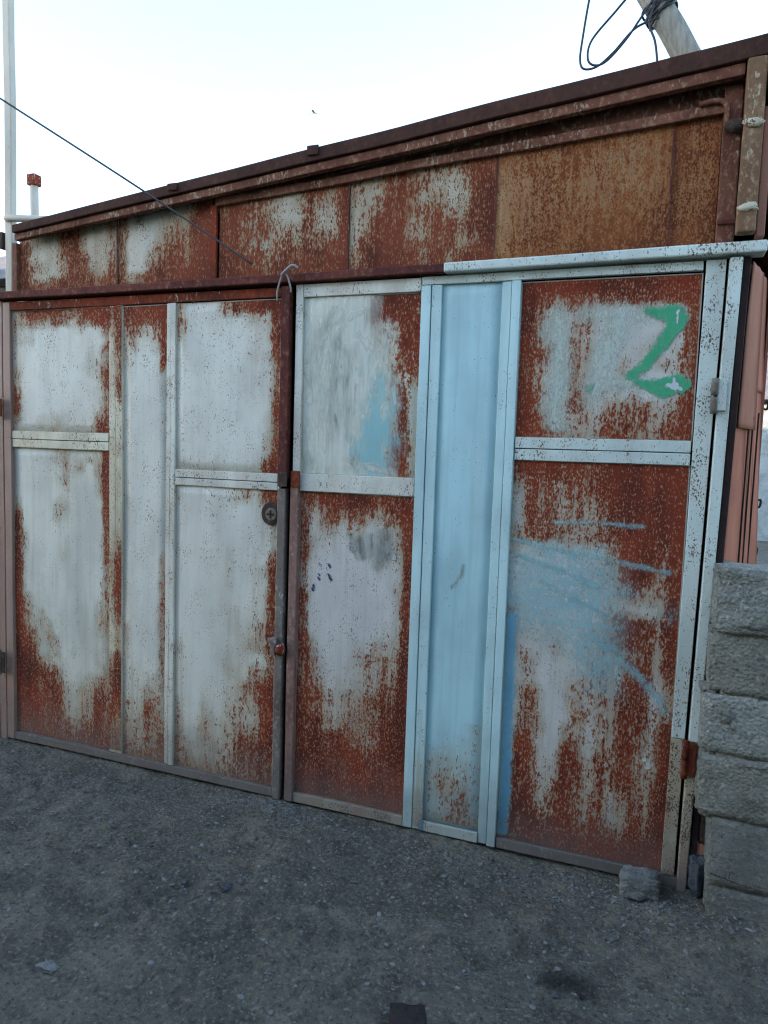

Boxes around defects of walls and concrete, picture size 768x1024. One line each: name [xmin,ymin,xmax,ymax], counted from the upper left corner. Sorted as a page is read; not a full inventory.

corrosion [13,299,281,786]
corrosion [20,115,723,291]
corrosion [295,491,480,828]
corrosion [365,293,421,477]
corrosion [497,460,689,871]
corrosion [516,274,702,441]